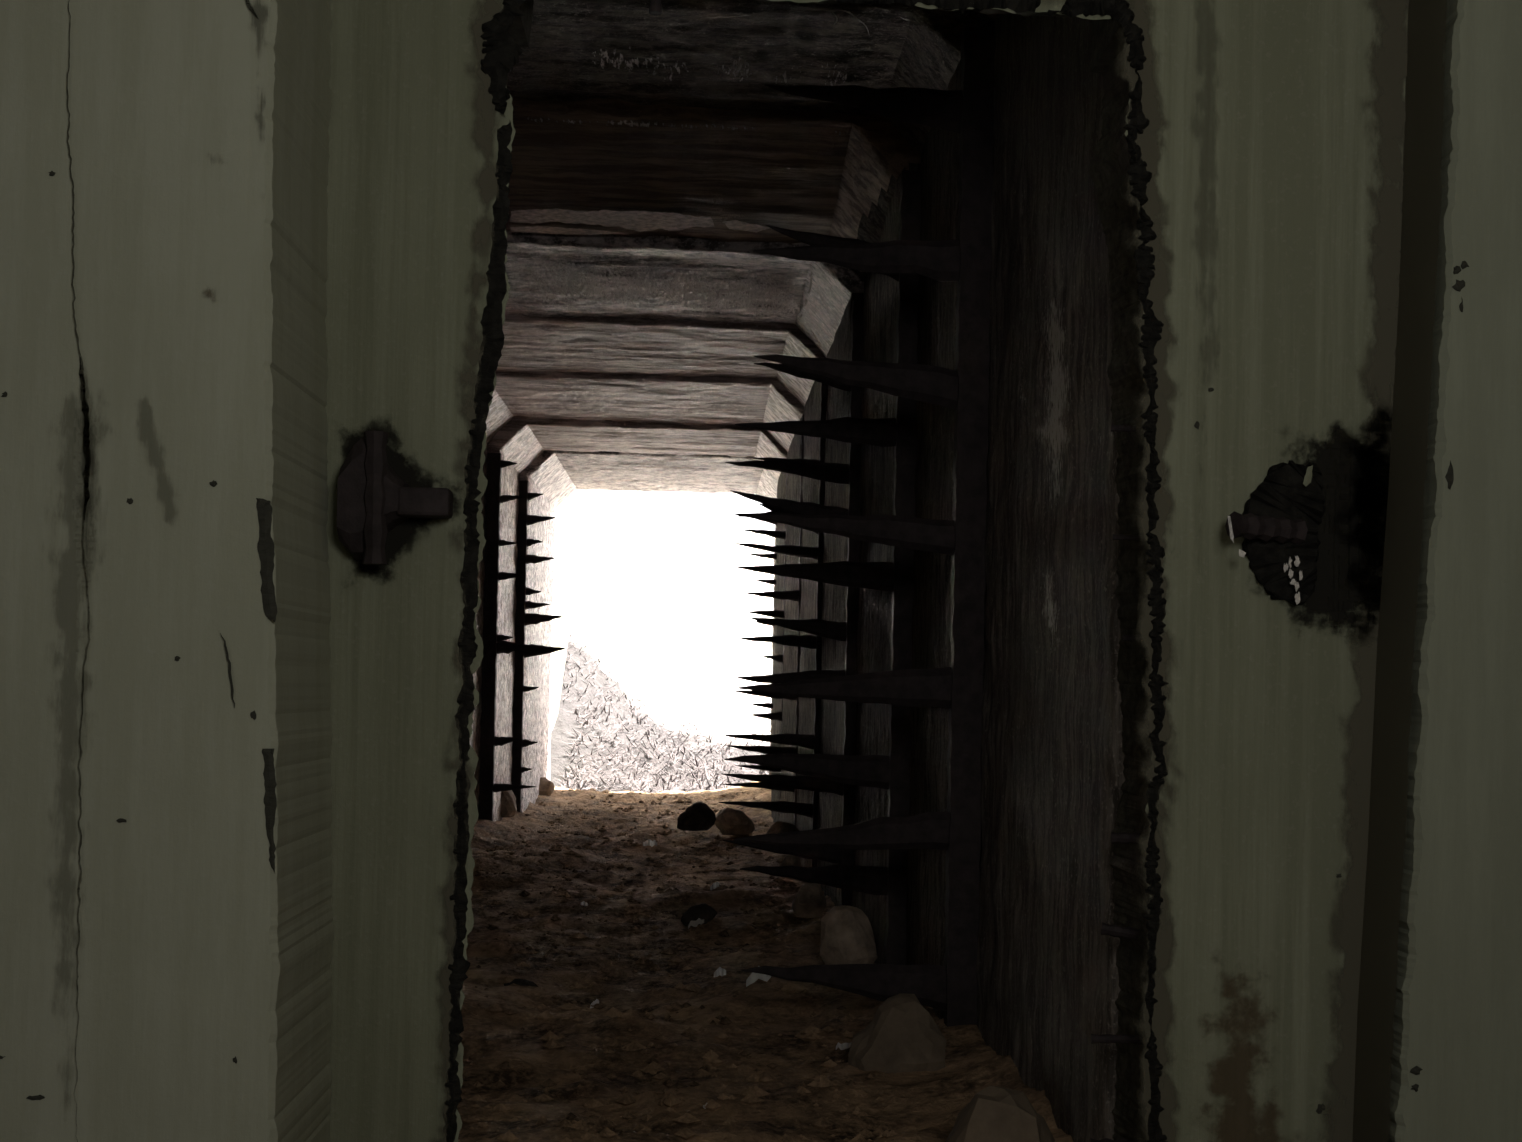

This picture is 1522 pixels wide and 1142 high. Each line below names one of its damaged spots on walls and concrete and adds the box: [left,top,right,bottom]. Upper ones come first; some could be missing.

peeling [1303,465,1313,486]
peeling [1228,516,1246,557]
crack [67,0,91,1142]
peeling [1283,555,1303,604]